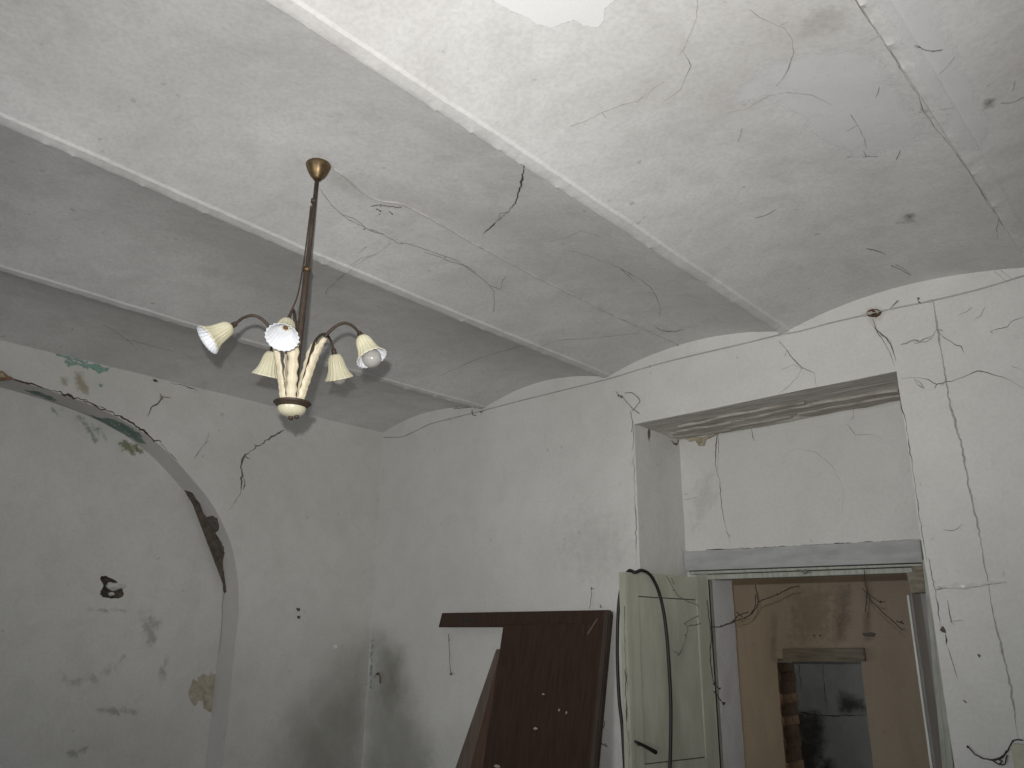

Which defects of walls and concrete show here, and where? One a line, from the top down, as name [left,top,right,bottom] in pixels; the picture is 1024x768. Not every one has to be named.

crack [572,0,698,126]
crack [727,11,826,141]
crack [855,0,1003,231]
crack [483,166,524,234]
spalling [100,576,127,599]
spalling [184,490,226,593]
crack [229,430,284,510]
crack [708,302,1024,741]
flaking render [188,674,216,712]